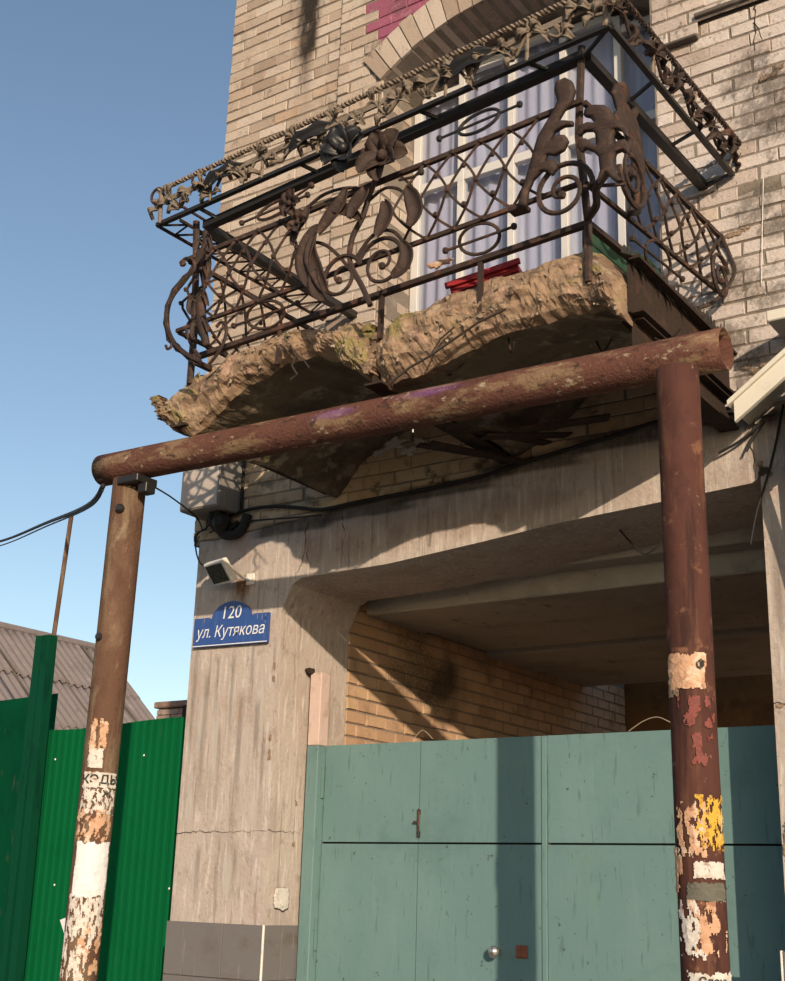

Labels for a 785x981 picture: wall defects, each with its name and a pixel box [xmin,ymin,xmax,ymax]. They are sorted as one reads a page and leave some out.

spalling [381,264,556,379]
spalling [565,254,623,315]
spalling [157,323,364,428]
crack [177,827,293,835]